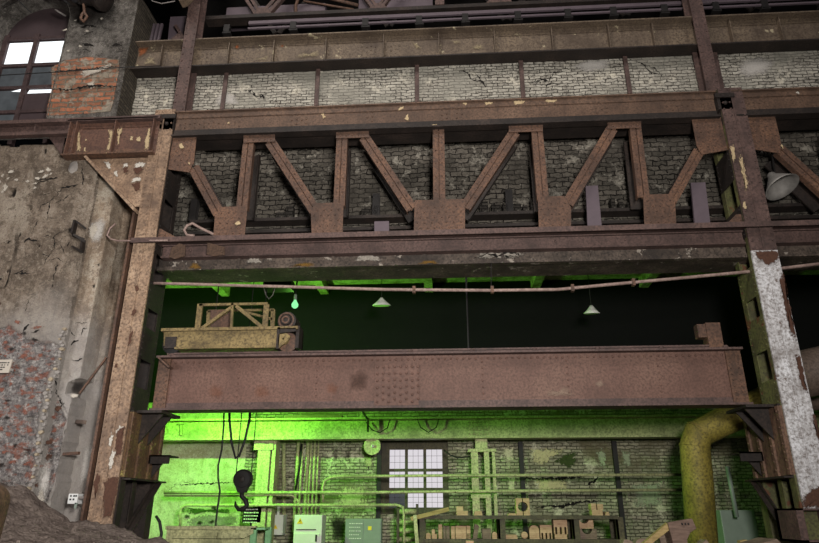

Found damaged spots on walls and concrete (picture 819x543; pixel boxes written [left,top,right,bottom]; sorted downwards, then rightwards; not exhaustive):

spalling [47,50,119,116]
peeling [0,167,52,197]
peeling [730,146,748,190]
crack [24,177,75,287]
rust [754,250,780,265]
rust [779,274,796,337]
rust [795,354,808,393]
spalling [0,320,67,502]
rust [802,486,819,508]